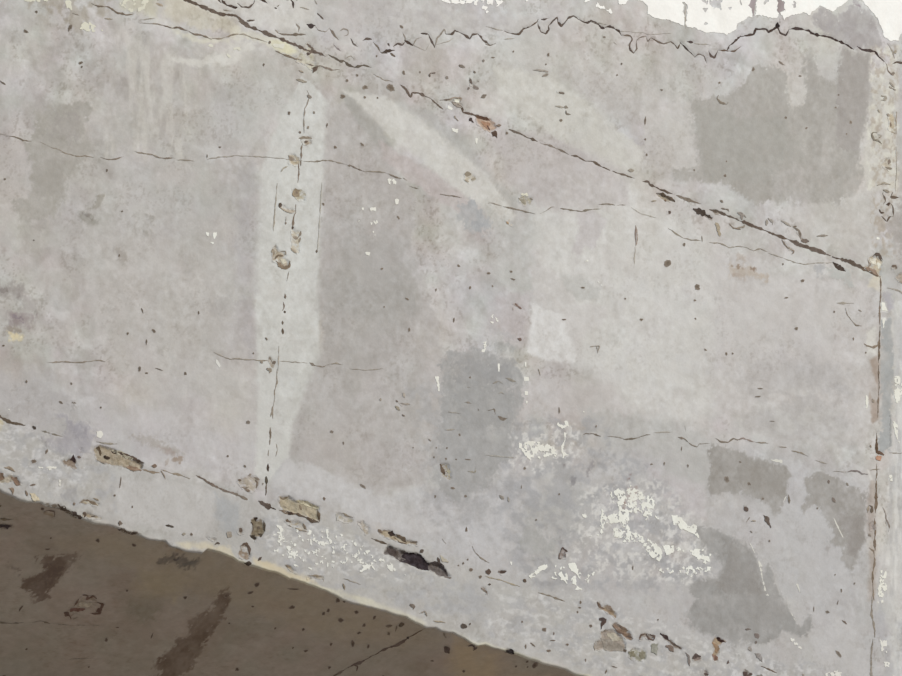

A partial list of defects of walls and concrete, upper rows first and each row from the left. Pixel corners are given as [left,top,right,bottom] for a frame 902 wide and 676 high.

crack [73,0,902,74]
peeling [640,0,848,35]
peeling [862,0,902,53]
water stain [668,0,886,210]
crack [0,133,418,189]
crack [493,203,832,265]
crack [583,427,878,475]
spalling [206,495,512,595]
water stain [703,441,871,573]
water stain [148,585,234,676]
spalling [589,600,729,676]
water stain [682,524,816,661]